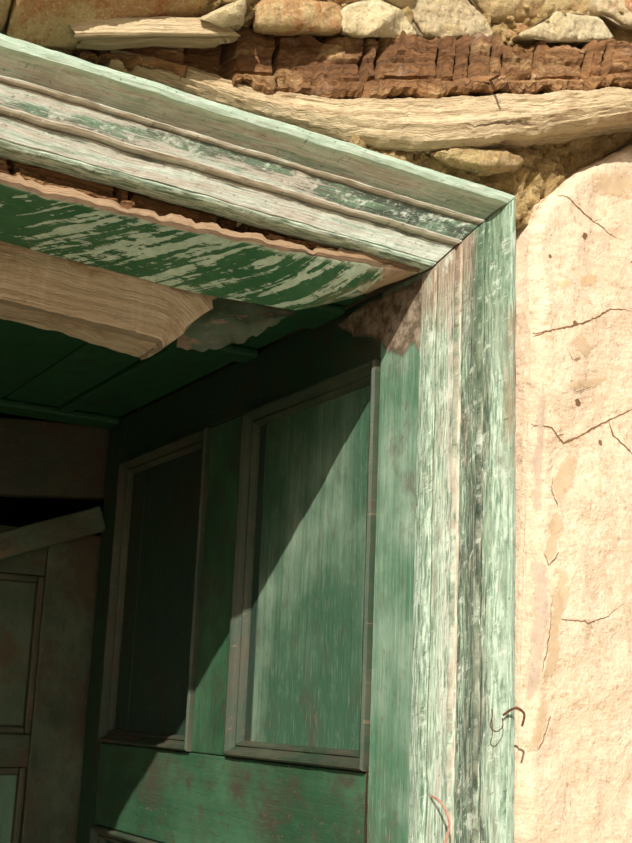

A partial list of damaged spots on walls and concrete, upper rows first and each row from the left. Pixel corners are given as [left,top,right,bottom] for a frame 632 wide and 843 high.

crack [558,195,622,240]
crack [533,308,627,334]
crack [531,409,632,454]